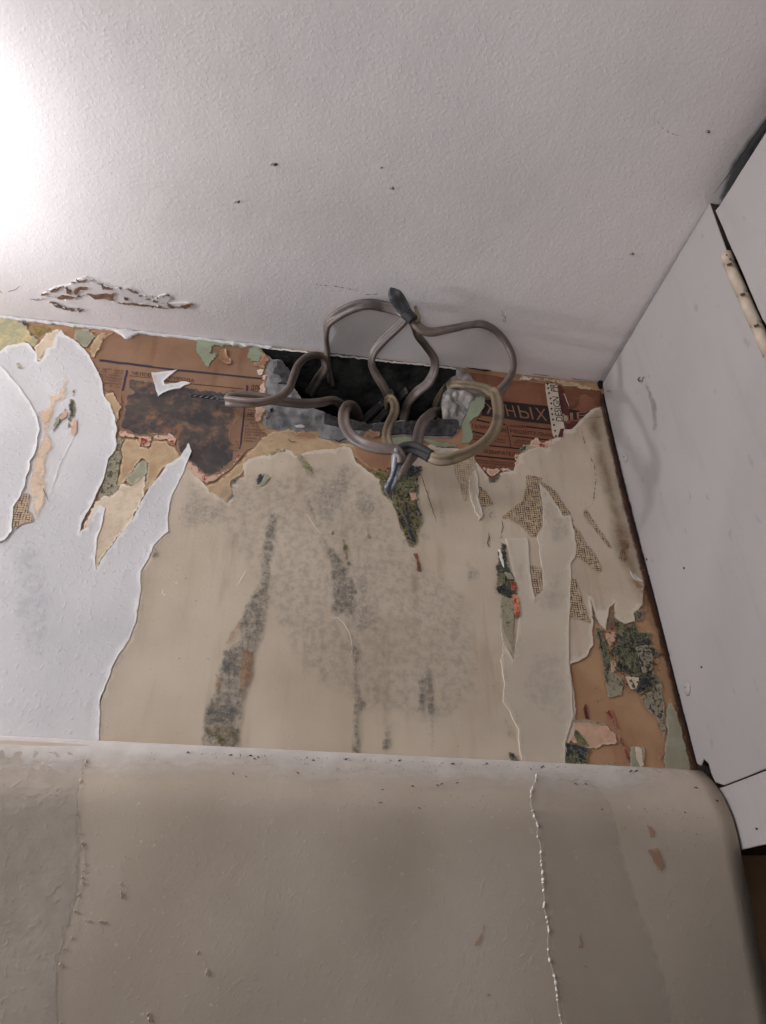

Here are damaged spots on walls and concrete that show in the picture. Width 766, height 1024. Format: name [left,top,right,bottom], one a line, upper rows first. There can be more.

spalling [0,276,469,443]
water stain [374,465,420,539]
water stain [205,516,275,747]